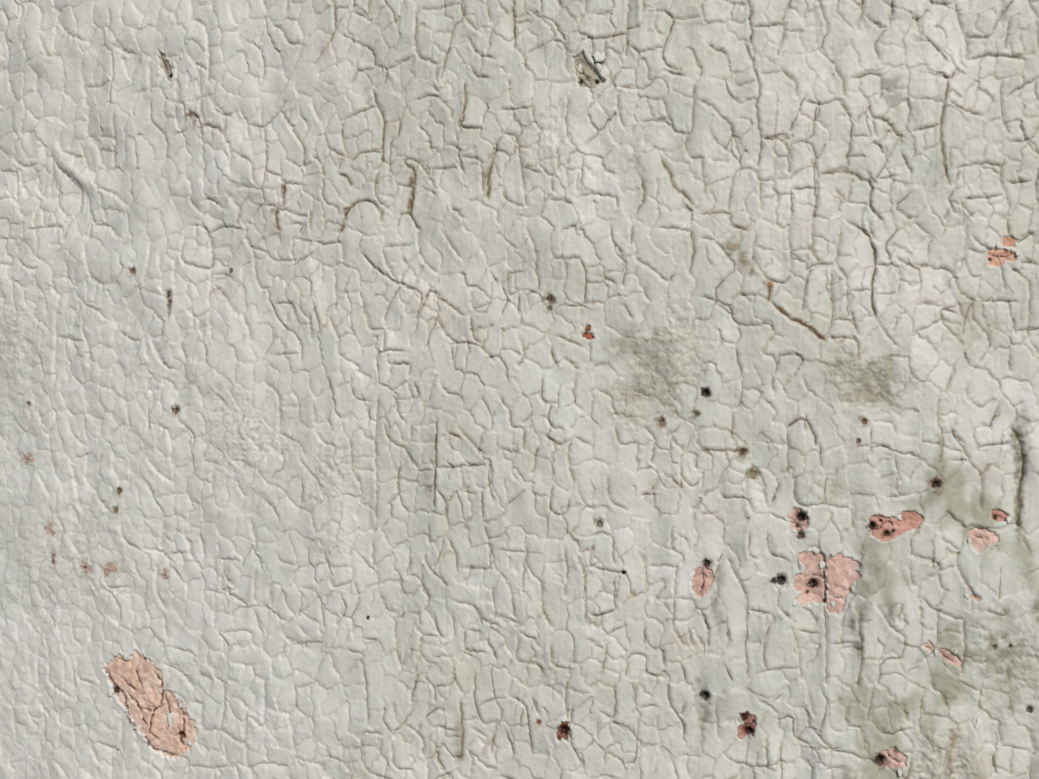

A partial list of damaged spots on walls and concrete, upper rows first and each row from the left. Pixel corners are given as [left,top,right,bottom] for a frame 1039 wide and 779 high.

peeling [987,236,1020,267]
peeling [787,508,811,538]
peeling [867,511,923,542]
peeling [967,509,1011,553]
peeling [691,558,714,598]
peeling [792,551,861,615]
peeling [104,650,198,760]
peeling [735,711,756,739]
peeling [874,747,907,777]